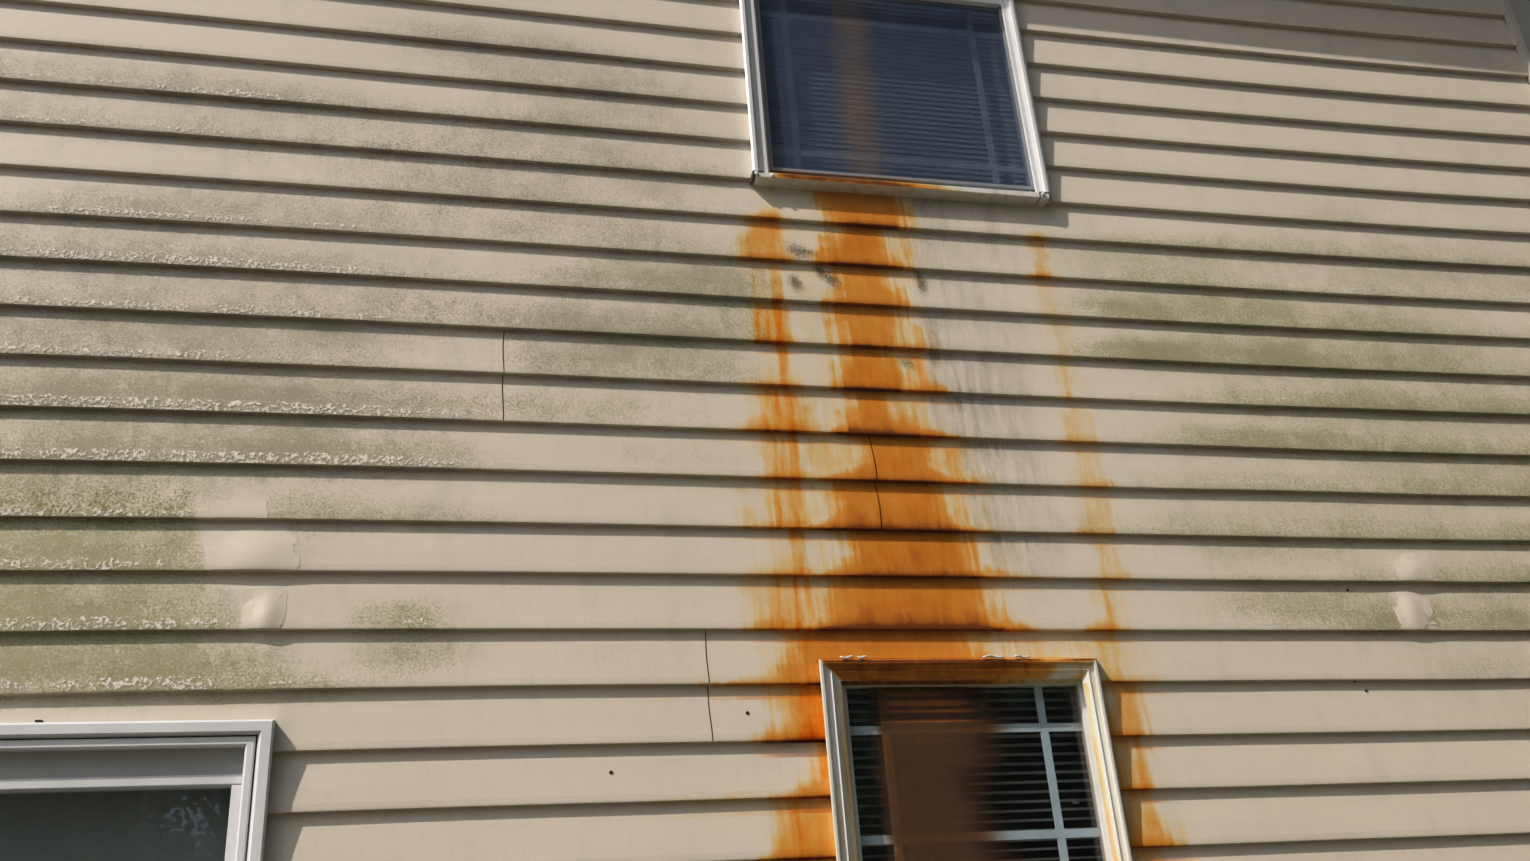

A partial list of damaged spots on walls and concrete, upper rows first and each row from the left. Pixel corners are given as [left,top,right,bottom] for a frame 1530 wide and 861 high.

corrosion [837,220,905,240]
corrosion [817,258,903,270]
corrosion [826,301,907,309]
corrosion [850,341,893,350]
corrosion [834,382,944,395]
corrosion [832,423,944,439]
corrosion [832,461,959,485]
corrosion [811,511,985,579]
corrosion [815,602,1006,631]
corrosion [763,732,826,744]
corrosion [788,657,1042,861]
corrosion [773,852,834,861]